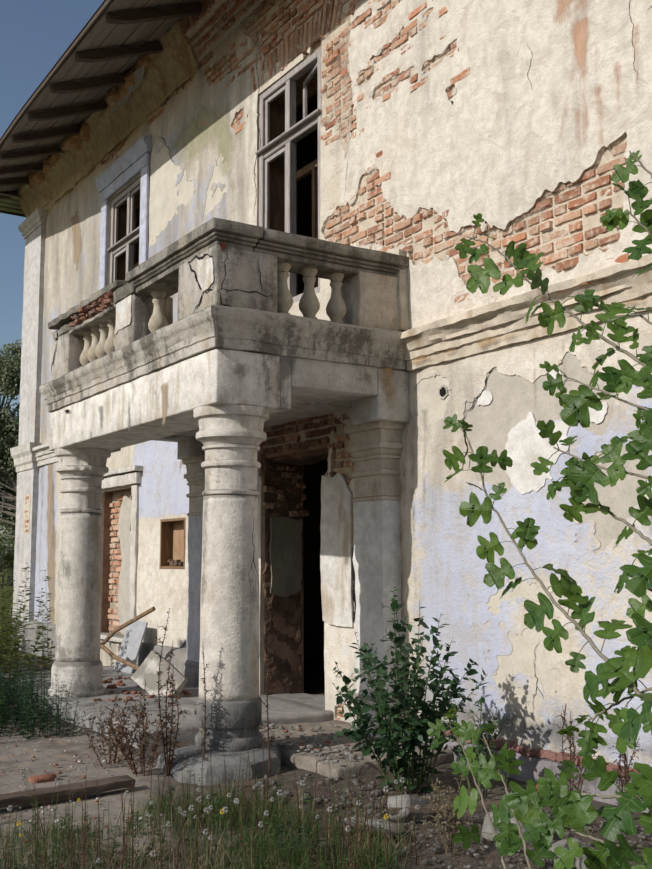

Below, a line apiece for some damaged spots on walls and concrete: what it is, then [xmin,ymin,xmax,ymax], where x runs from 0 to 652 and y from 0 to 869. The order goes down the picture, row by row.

flaking render [147,0,459,166]
flaking render [446,67,470,98]
flaking render [68,131,133,195]
flaking render [323,135,629,303]
flaking render [68,291,132,335]
crack [187,252,274,312]
flaking render [259,413,355,486]
flaking render [410,373,451,425]
crack [462,368,495,467]
flaking render [464,352,616,496]
flaking render [573,444,649,555]